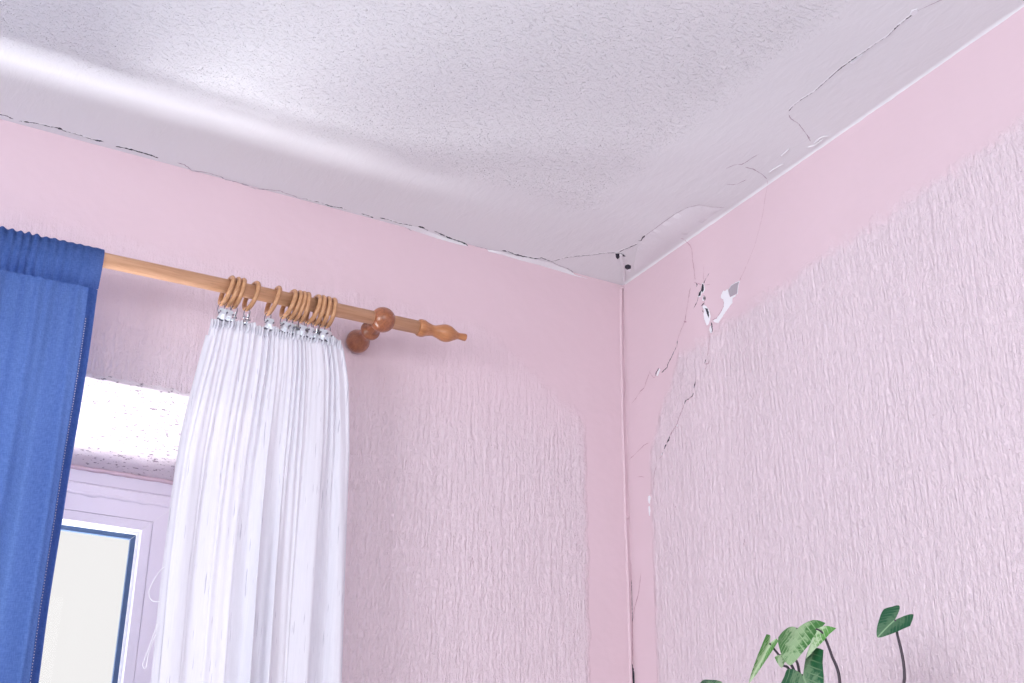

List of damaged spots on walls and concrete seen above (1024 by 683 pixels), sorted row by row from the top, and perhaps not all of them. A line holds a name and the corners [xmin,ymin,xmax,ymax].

crack [788,0,941,140]
crack [0,113,768,399]
flaking render [694,273,742,334]
crack [631,336,710,517]
crack [631,576,641,683]